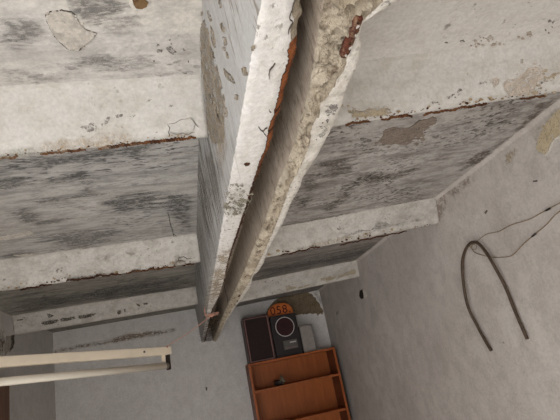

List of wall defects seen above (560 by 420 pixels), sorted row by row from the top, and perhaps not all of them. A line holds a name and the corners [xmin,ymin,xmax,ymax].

peeling [45,9,97,51]
rust [339,15,363,58]
peeling [200,10,235,148]
peeling [448,59,560,105]
rust [423,102,488,116]
rust [37,134,196,155]
peeling [360,116,437,148]
crack [205,0,324,340]
spalling [213,0,401,342]
rust [66,263,194,282]